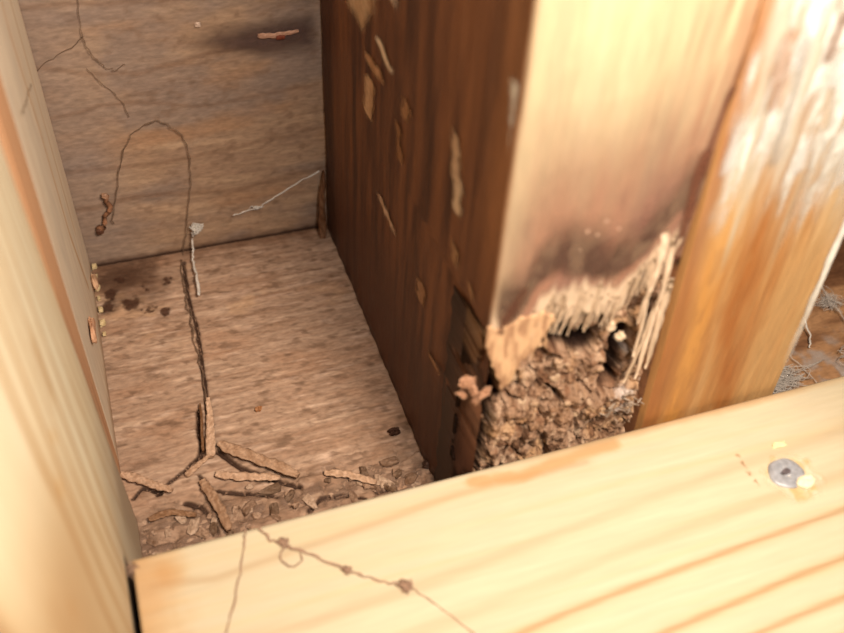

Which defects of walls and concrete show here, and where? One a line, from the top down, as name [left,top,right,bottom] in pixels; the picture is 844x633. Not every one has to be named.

water stain [215,21,310,51]
peeling [347,0,375,27]
peeling [364,38,392,120]
peeling [510,80,518,128]
peeling [451,129,462,216]
peeling [379,195,395,233]
water stain [498,88,736,327]
crack [132,262,388,513]
crack [183,502,220,534]